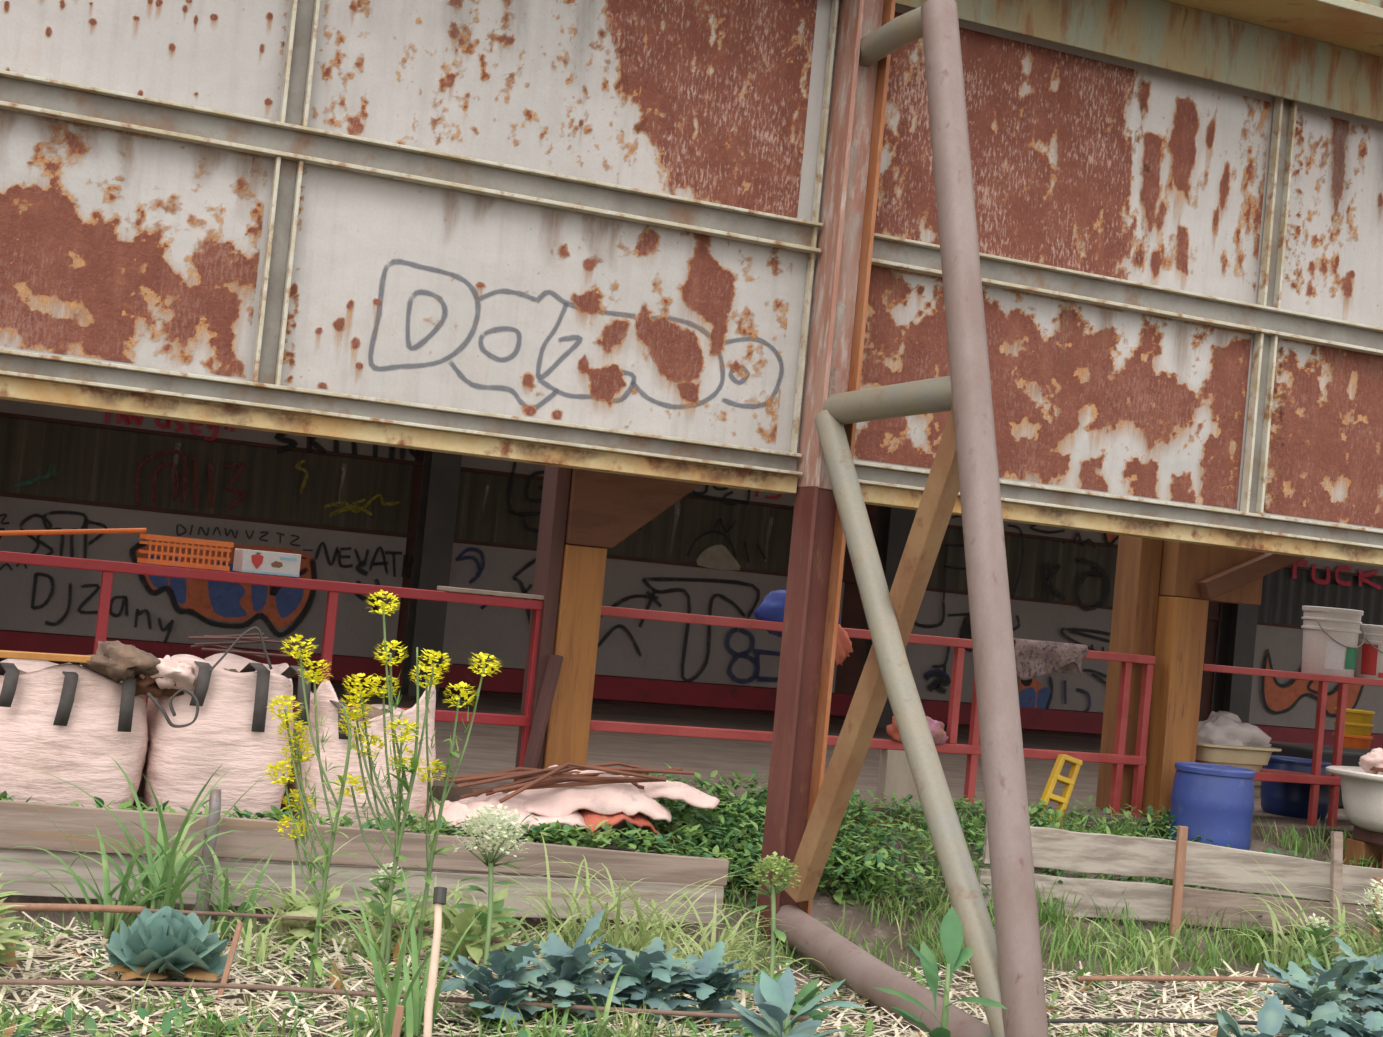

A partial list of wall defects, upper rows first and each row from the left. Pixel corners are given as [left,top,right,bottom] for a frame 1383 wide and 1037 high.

rust [0,119,266,377]
rust [313,5,368,135]
rust [432,0,529,144]
rust [508,0,817,218]
rust [571,232,789,443]
rust [854,411,950,468]
rust [860,265,950,387]
rust [874,38,940,245]
rust [959,27,1271,280]
rust [983,290,1251,509]
rust [1263,339,1383,528]
rust [1285,117,1370,299]